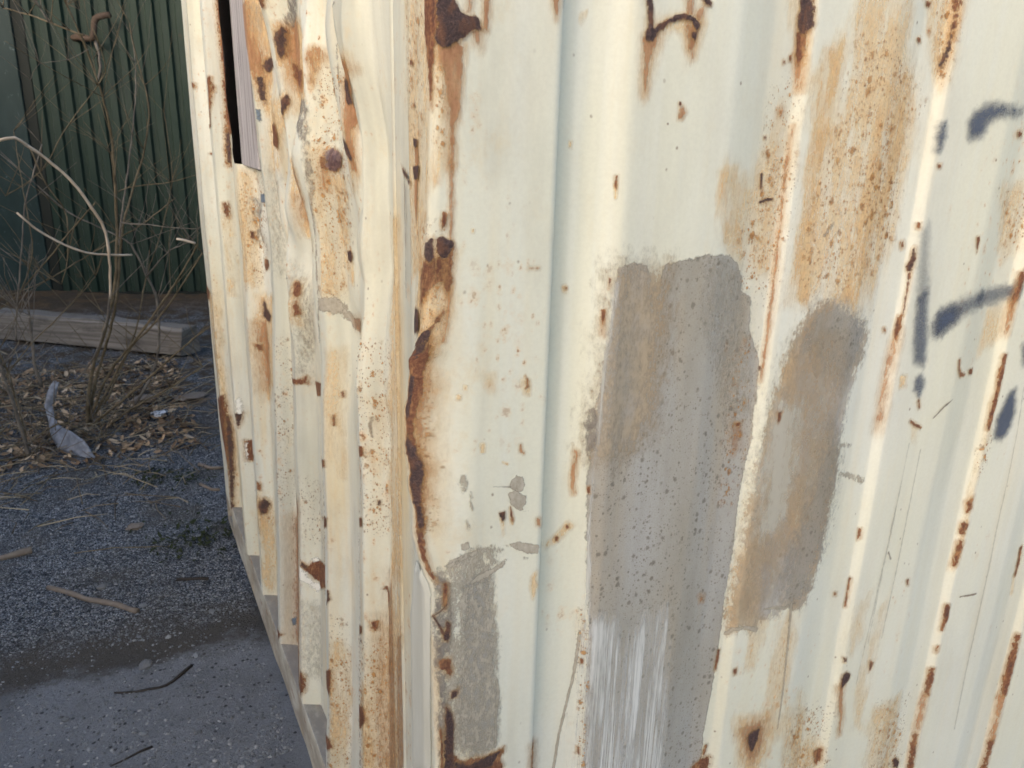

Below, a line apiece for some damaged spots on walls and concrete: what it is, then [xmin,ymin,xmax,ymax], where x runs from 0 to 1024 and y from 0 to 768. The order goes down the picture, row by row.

rust [242,0,358,294]
rust [733,0,963,380]
rust [207,287,235,508]
rust [254,298,321,441]
rust [326,0,490,768]
rust [876,242,916,421]
rust [977,354,1007,470]
rust [256,469,326,696]
rust [952,498,974,567]
rust [453,746,505,768]
rust [873,668,935,768]
rust [980,633,1021,768]